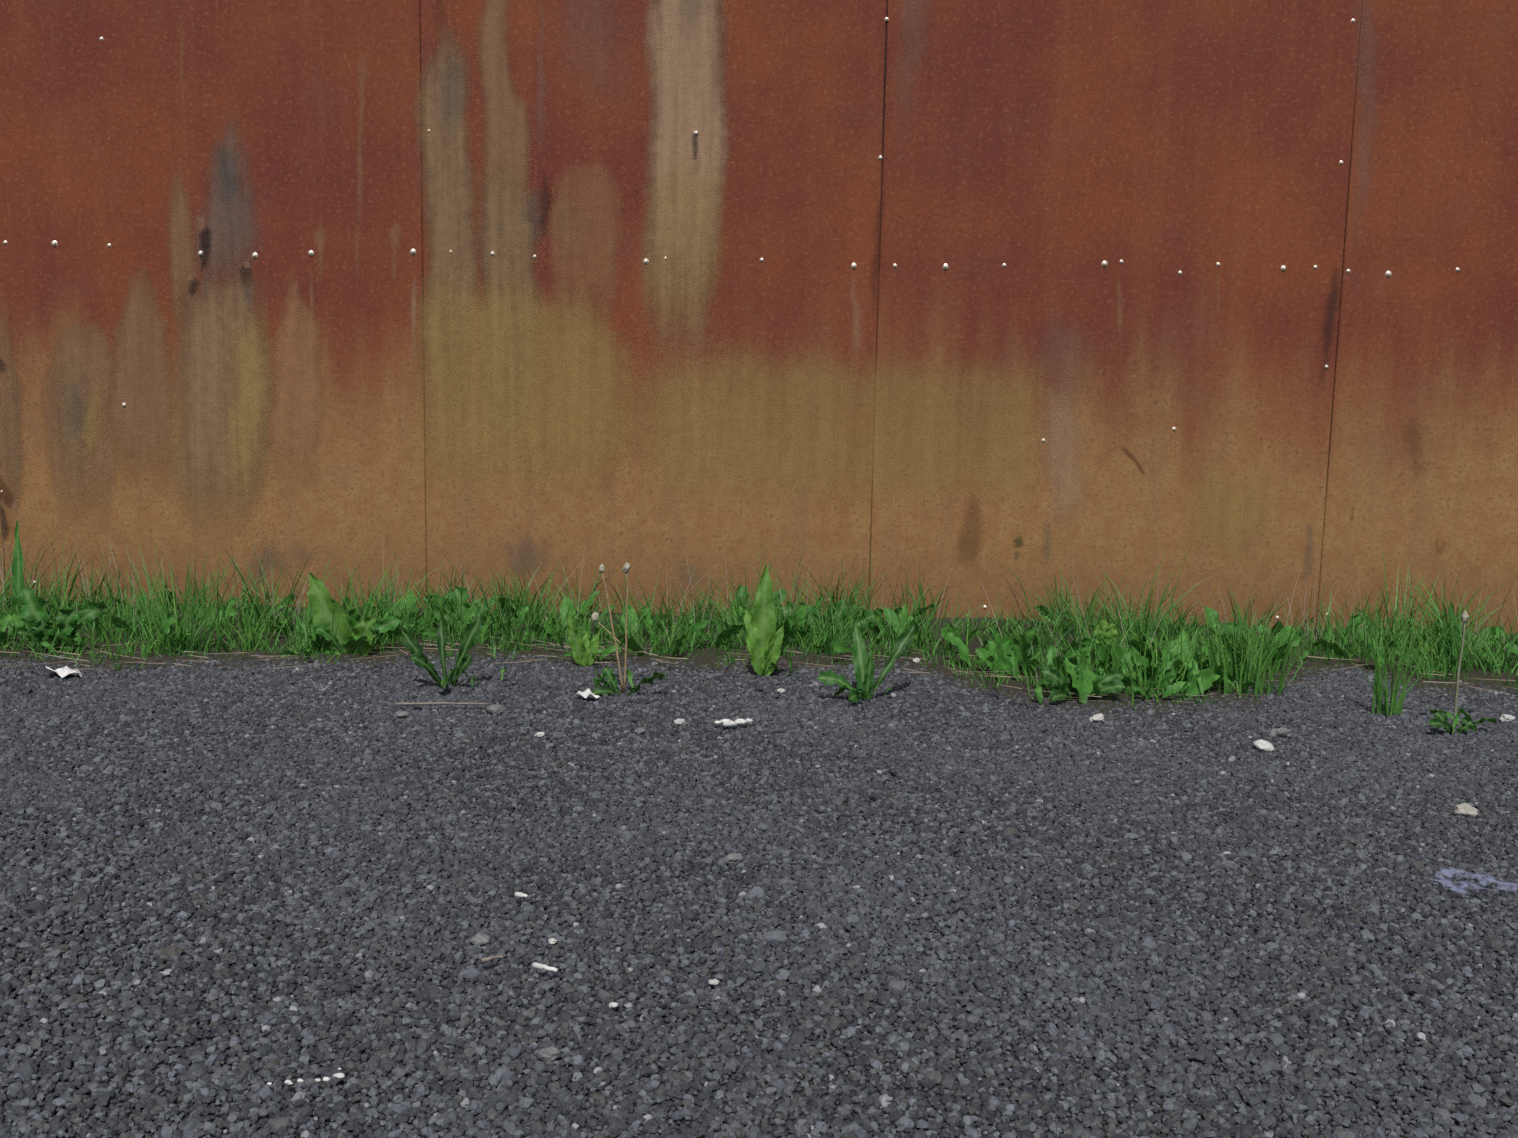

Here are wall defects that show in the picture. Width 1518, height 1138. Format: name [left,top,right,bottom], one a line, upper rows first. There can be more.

rust [113,185,269,500]
rust [421,0,536,399]
rust [647,0,726,298]